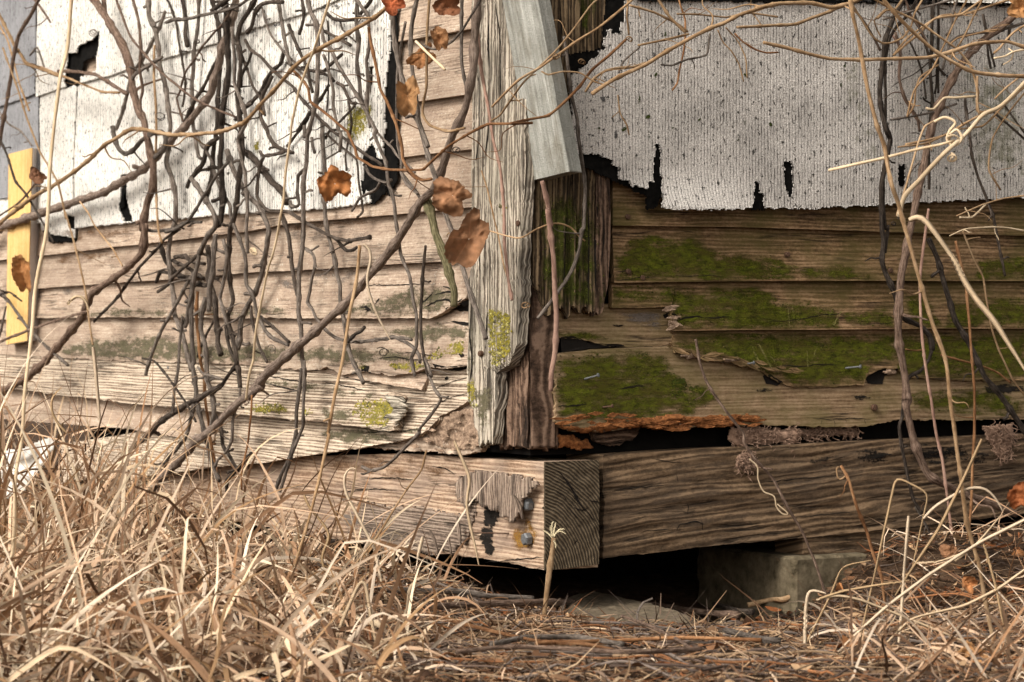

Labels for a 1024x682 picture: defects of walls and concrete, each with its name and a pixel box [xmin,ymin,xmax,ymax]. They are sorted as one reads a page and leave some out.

peeling [550,411,767,432]
peeling [357,470,540,556]